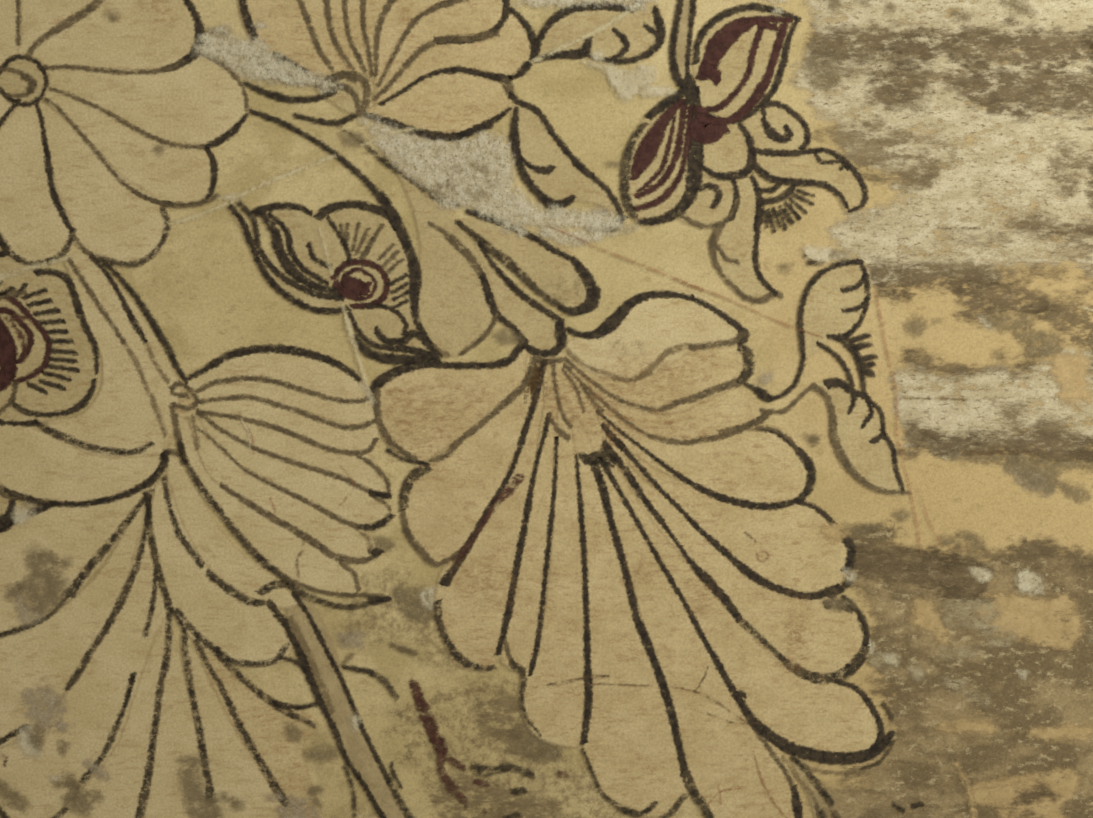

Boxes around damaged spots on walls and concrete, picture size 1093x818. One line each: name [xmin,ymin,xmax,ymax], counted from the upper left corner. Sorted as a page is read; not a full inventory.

flaking render [517,0,650,9]
flaking render [194,23,342,93]
flaking render [590,51,674,100]
peeling [791,0,1093,284]
flaking render [343,114,630,246]
peeling [888,348,1093,460]
water stain [853,533,994,604]
water stain [1018,539,1093,567]
spalling [818,524,1093,818]